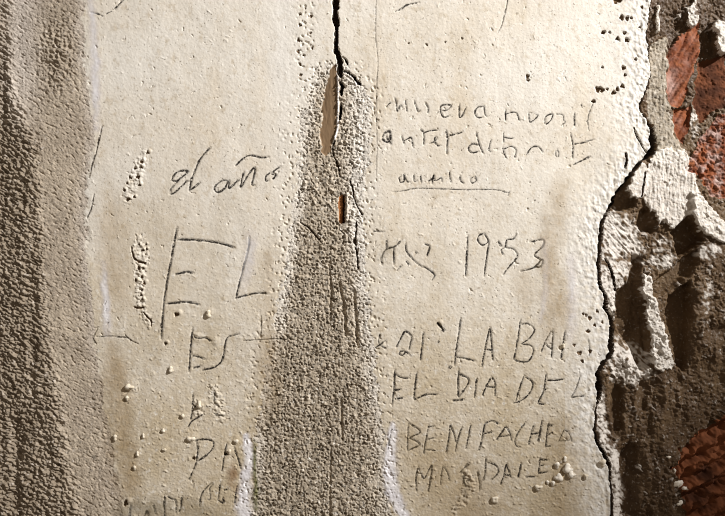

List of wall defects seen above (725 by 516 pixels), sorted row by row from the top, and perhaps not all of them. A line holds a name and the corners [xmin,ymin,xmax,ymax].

spalling [248,60,393,516]
crack [332,0,362,120]
crack [333,141,364,269]
spalling [582,0,725,516]